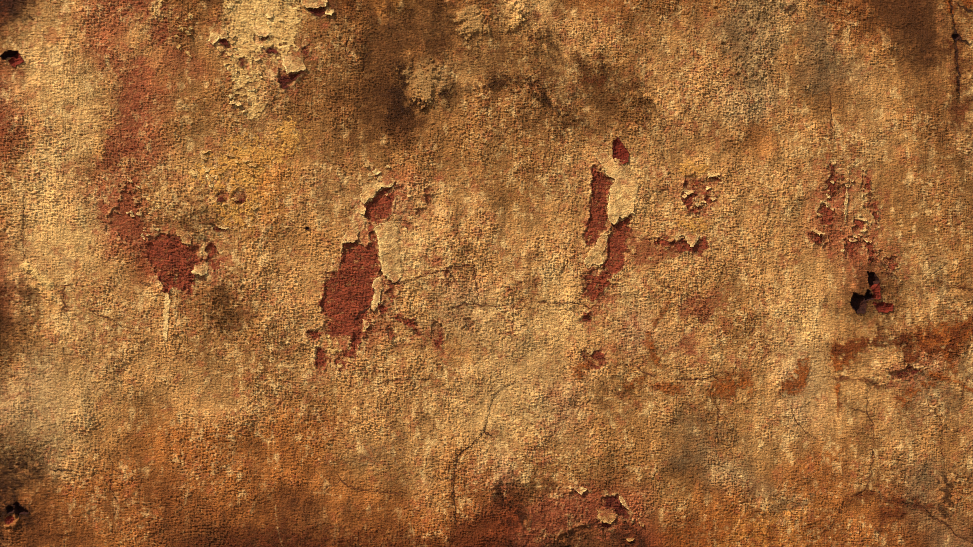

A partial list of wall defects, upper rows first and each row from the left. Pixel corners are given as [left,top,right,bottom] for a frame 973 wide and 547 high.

peeling [300,0,334,17]
spalling [8,53,24,67]
peeling [208,10,310,112]
crack [949,0,973,101]
peeling [192,149,258,211]
peeling [677,171,721,215]
peeling [141,225,232,297]
peeling [305,163,445,372]
peeling [577,152,639,326]
peeling [654,231,711,258]
peeling [809,163,898,313]
peeling [597,496,644,531]